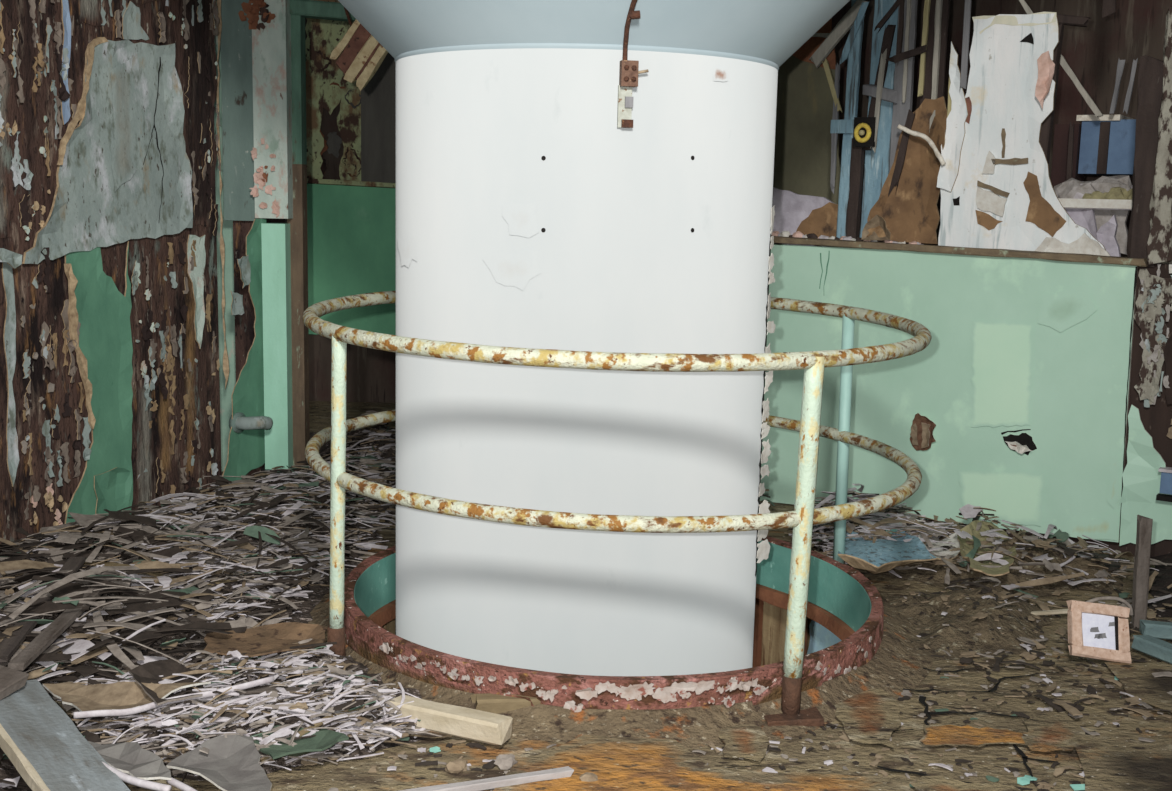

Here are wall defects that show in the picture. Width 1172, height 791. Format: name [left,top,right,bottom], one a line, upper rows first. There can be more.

peeling [305,18,361,184]
peeling [976,210,1002,230]
peeling [1023,172,1066,237]
peeling [0,0,280,530]
peeling [811,264,1172,598]
corrosion [346,629,534,706]
corrosion [752,680,782,705]
corrosion [801,672,824,692]